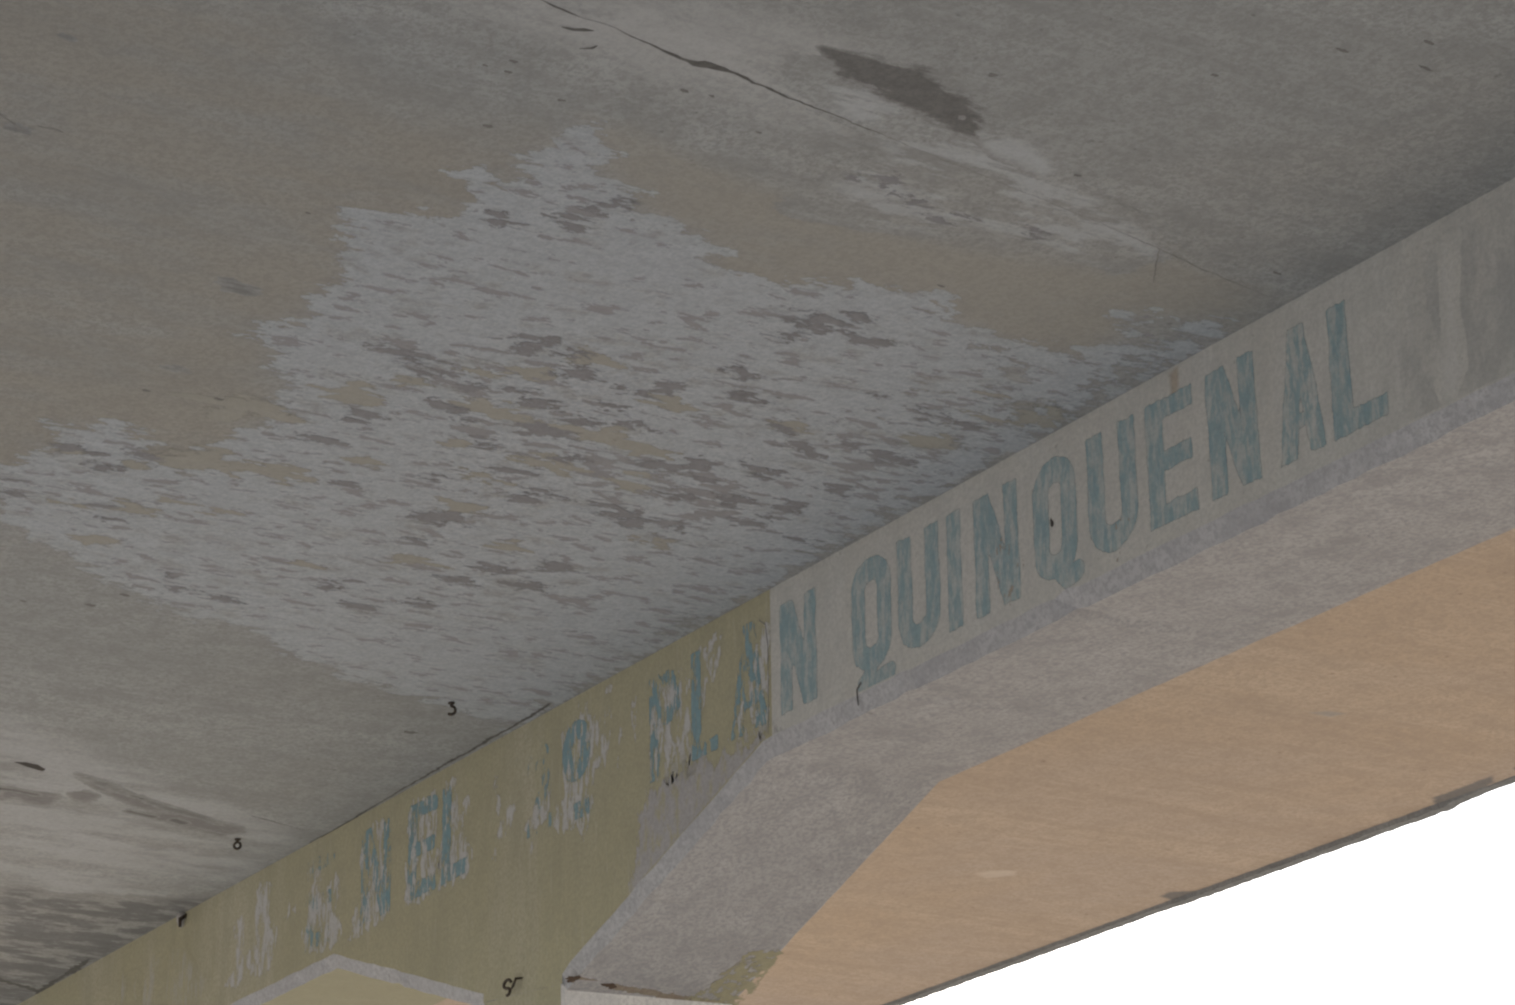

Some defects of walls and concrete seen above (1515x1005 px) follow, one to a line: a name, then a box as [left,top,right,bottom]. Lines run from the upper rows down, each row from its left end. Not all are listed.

peeling [0,120,1241,894]
water stain [0,0,1298,515]
crack [542,0,1267,296]